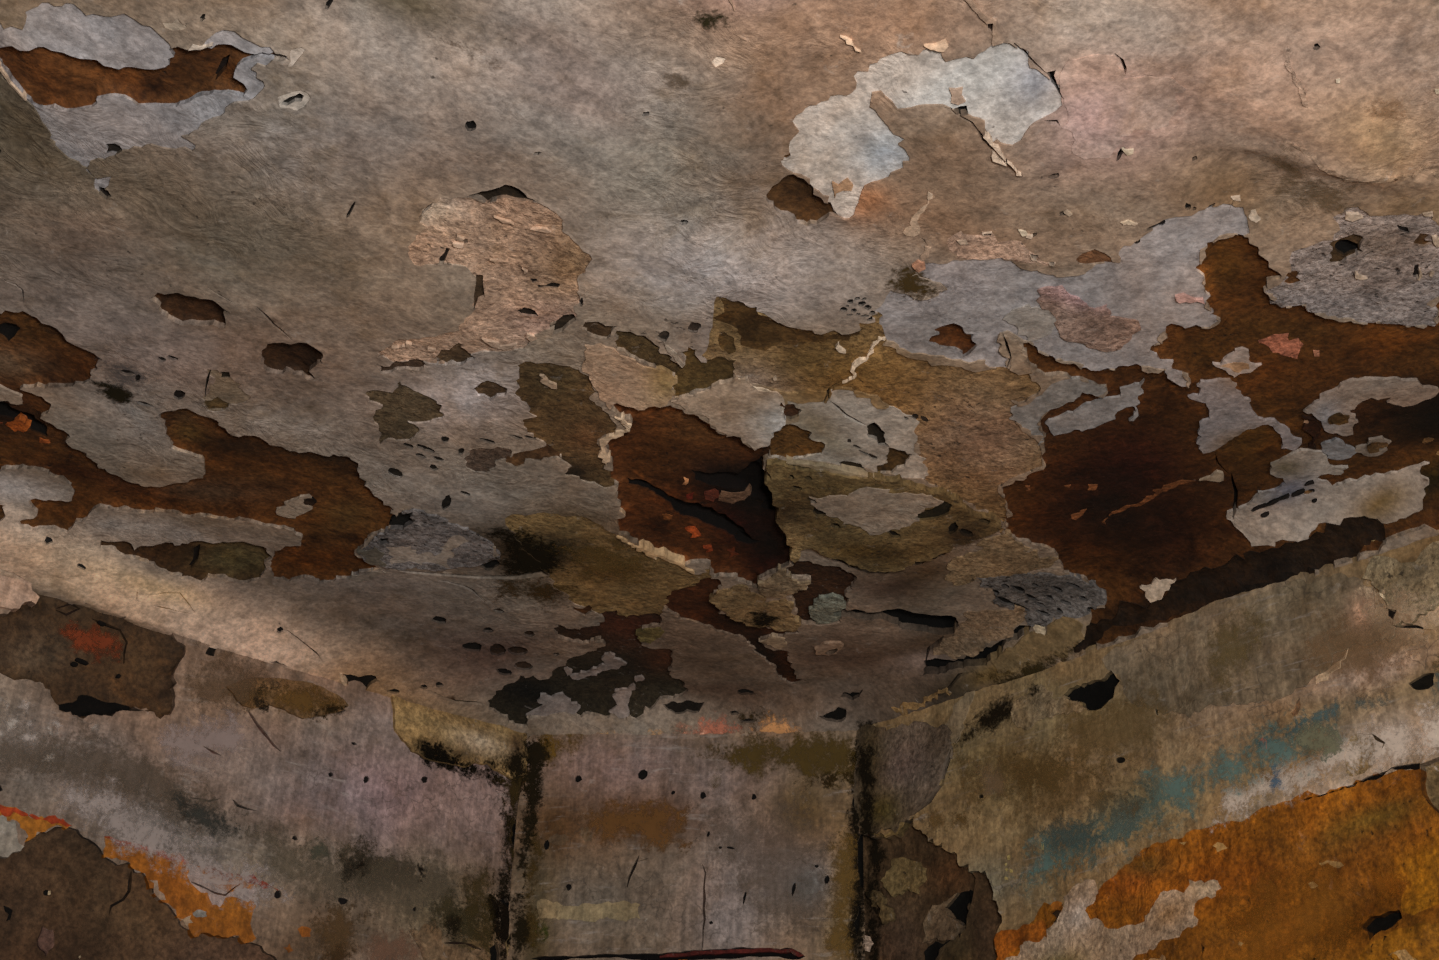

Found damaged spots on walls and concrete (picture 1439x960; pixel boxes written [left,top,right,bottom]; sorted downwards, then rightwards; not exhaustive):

peeling [278,90,311,111]
peeling [766,35,1187,226]
spalling [0,185,1439,730]
spalling [0,815,277,960]
water stain [0,651,583,960]
water stain [698,706,886,960]
spalling [854,687,1221,960]
peeling [1344,733,1385,777]